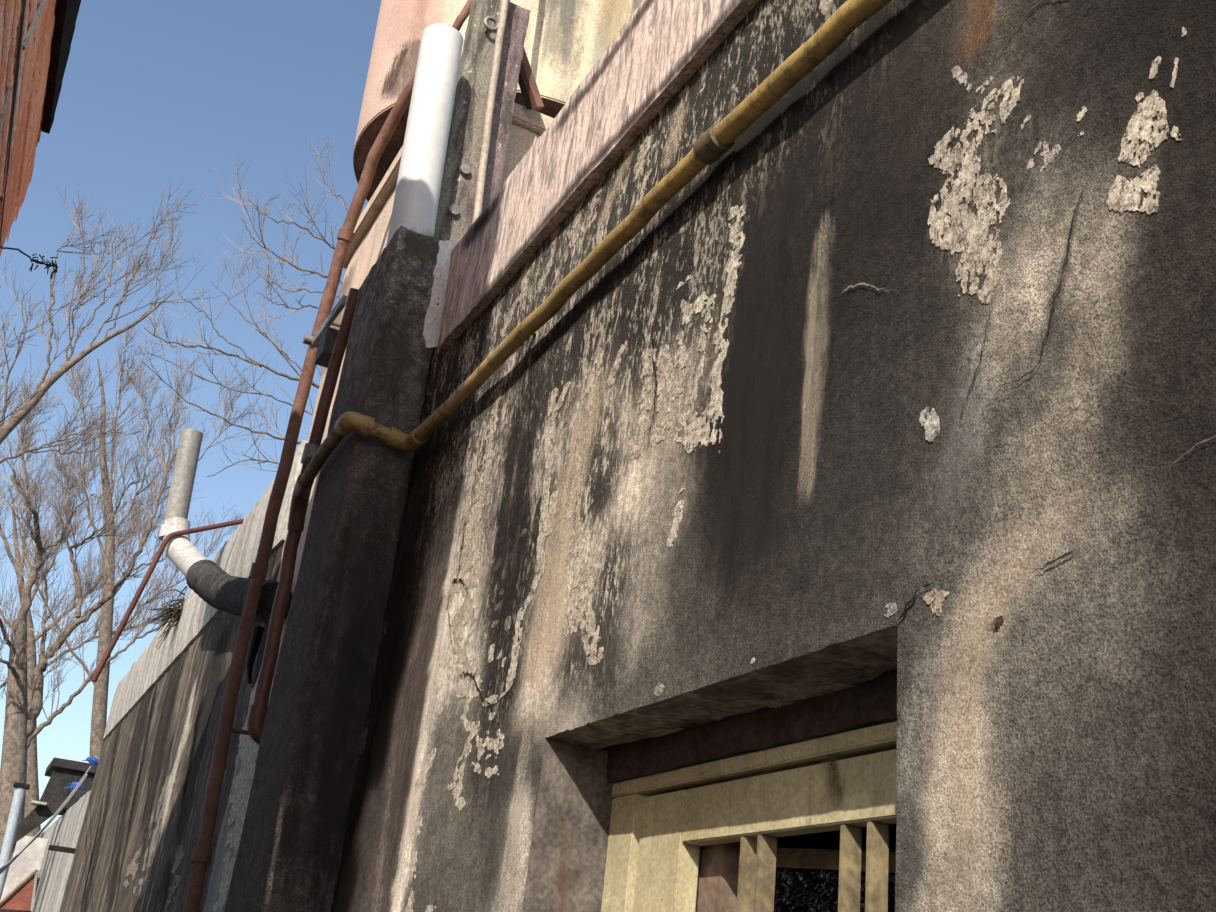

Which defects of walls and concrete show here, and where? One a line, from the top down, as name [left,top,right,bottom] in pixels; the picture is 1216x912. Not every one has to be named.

water stain [462,194,499,247]
peeling [500,255,553,337]
peeling [568,174,615,248]
peeling [627,205,746,458]
water stain [479,0,906,681]
spalling [919,407,940,442]
peeling [927,65,1031,304]
crack [955,180,1086,428]
peeling [1027,141,1061,172]
peeling [1107,56,1182,214]
peeling [435,338,627,811]
water stain [80,634,227,912]